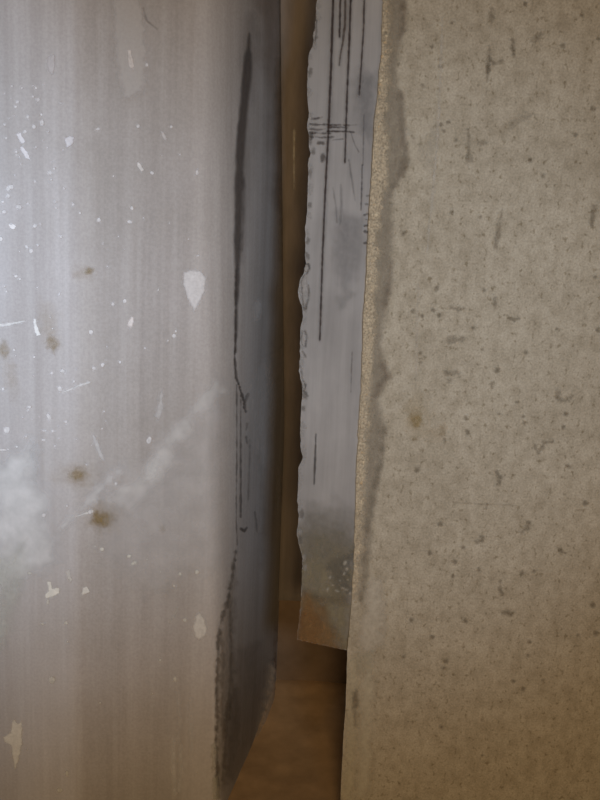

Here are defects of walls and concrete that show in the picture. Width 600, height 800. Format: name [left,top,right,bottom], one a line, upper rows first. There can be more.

peeling [183,270,206,310]
leakage [0,452,53,583]
peeling [45,582,59,598]
peeling [4,720,22,768]